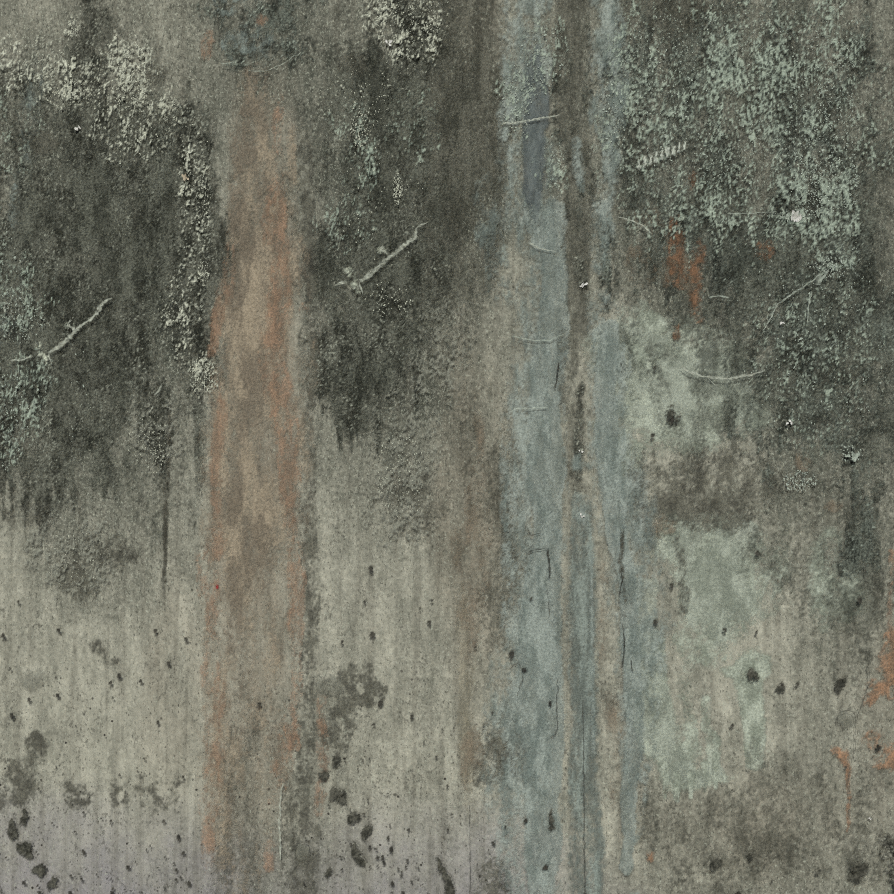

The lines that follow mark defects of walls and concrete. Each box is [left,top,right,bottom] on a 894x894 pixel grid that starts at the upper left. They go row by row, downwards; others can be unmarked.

water stain [0,0,239,587]
rust [206,70,308,853]
water stain [281,0,894,894]
water stain [55,535,138,600]
water stain [0,731,47,806]
water stain [65,781,90,808]
water stain [110,776,177,809]